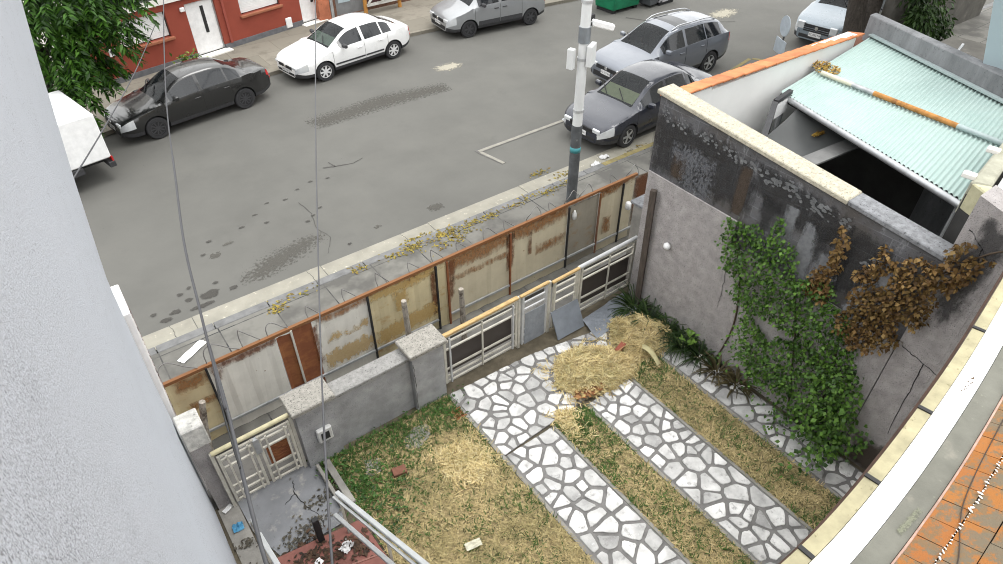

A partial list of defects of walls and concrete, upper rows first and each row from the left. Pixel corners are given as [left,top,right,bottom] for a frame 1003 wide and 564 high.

rust [449,208,568,296]
rust [632,173,648,208]
water stain [653,115,894,330]
rust [311,268,438,367]